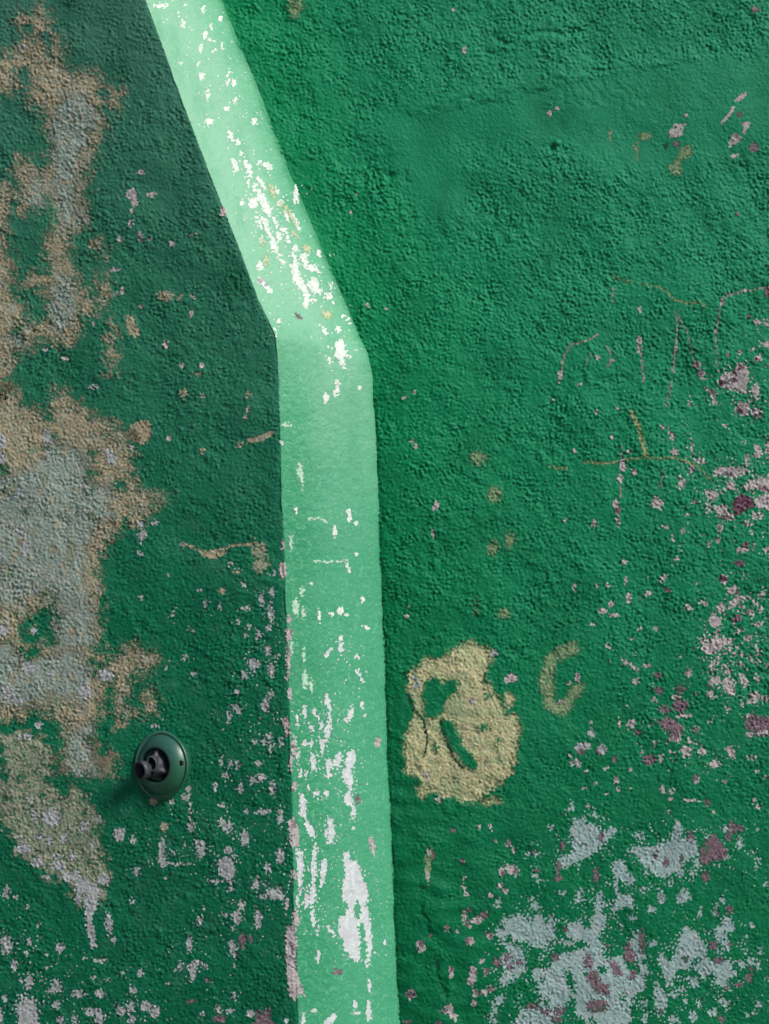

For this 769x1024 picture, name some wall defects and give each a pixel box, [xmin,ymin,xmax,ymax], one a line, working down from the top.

peeling [0,0,388,1024]
peeling [590,421,769,785]
peeling [688,310,769,433]
peeling [416,720,769,1024]